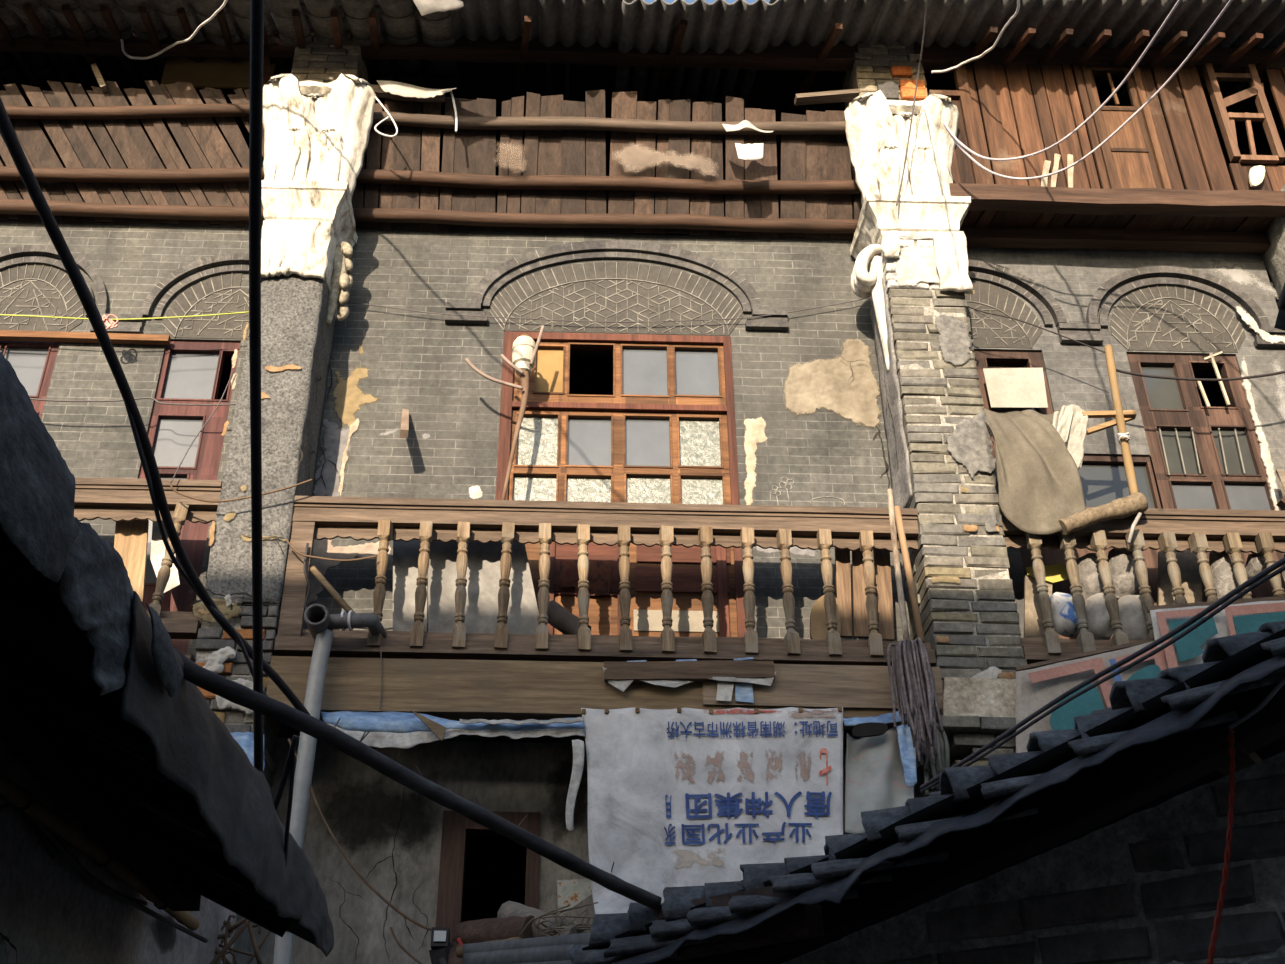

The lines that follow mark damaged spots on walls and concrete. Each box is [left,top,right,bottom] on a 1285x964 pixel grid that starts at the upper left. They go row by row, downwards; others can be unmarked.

peeling [313,345,379,497]
peeling [744,417,768,505]